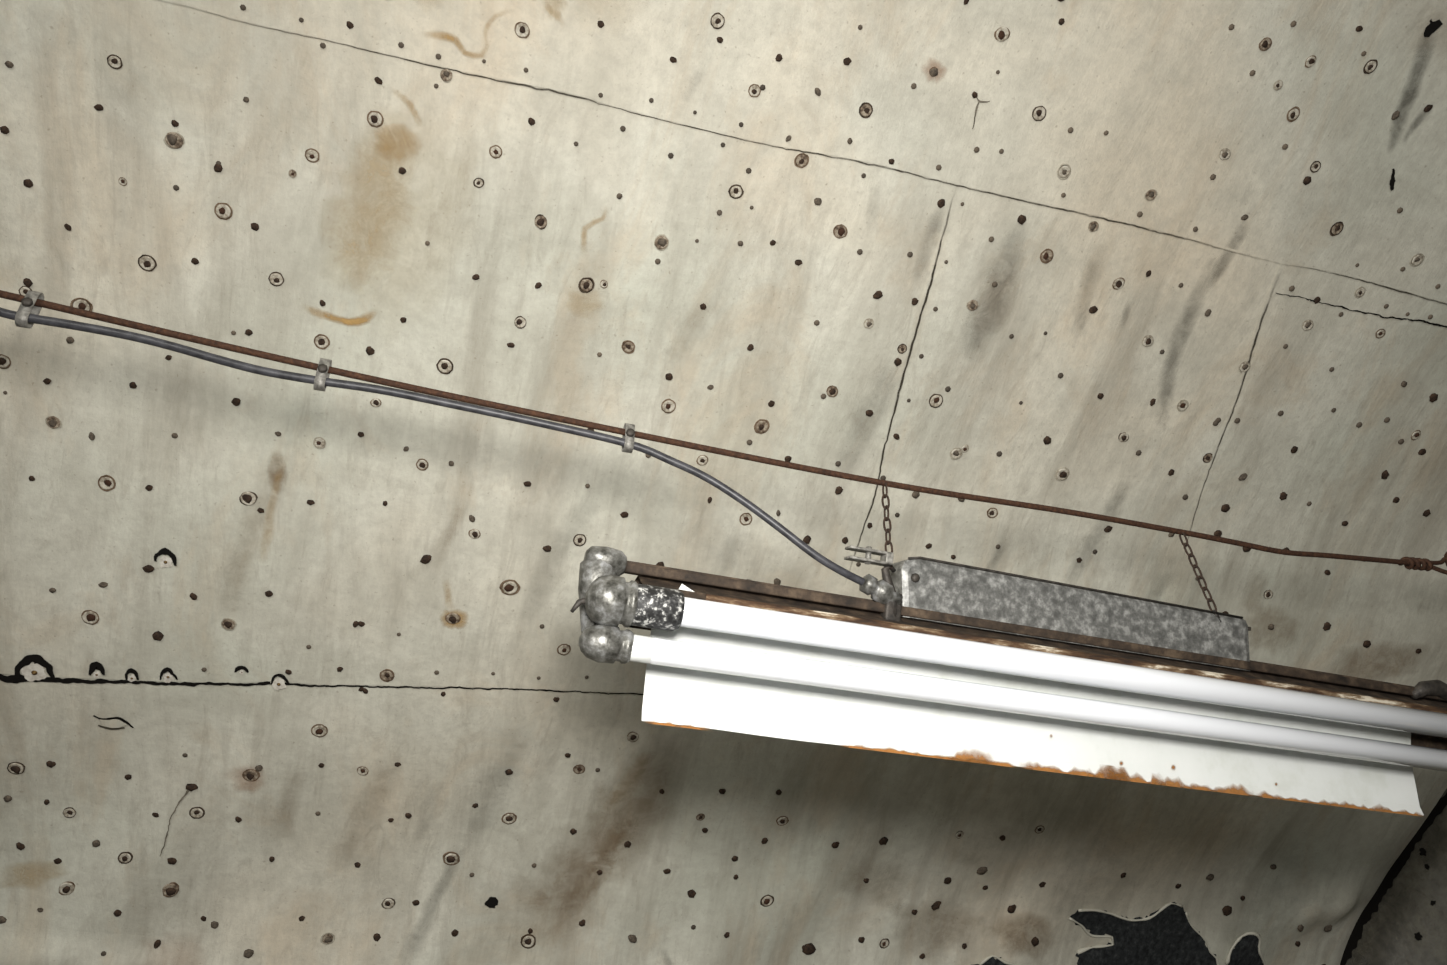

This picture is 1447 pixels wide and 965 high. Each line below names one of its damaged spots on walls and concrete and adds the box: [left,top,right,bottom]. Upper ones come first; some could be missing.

crack [1276,293,1447,328]
peeling [1068,902,1266,965]
peeling [974,955,1017,965]